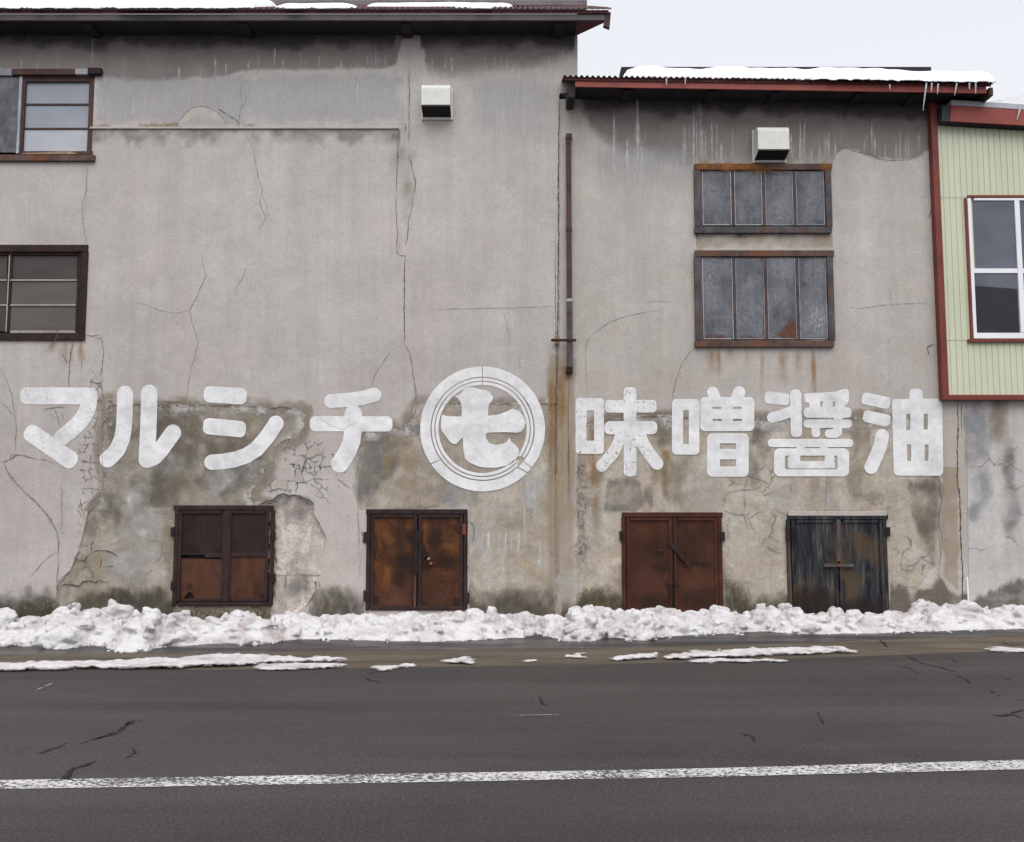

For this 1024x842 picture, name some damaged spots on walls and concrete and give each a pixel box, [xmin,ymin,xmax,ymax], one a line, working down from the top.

water stain [0,35,403,80]
water stain [425,38,575,81]
water stain [582,99,941,165]
crack [371,68,418,429]
crack [140,255,206,405]
crack [0,326,134,606]
peeling [57,400,326,620]
crack [259,419,360,569]
corrosion [548,359,574,532]
crack [723,401,1023,599]
water stain [890,466,1024,613]